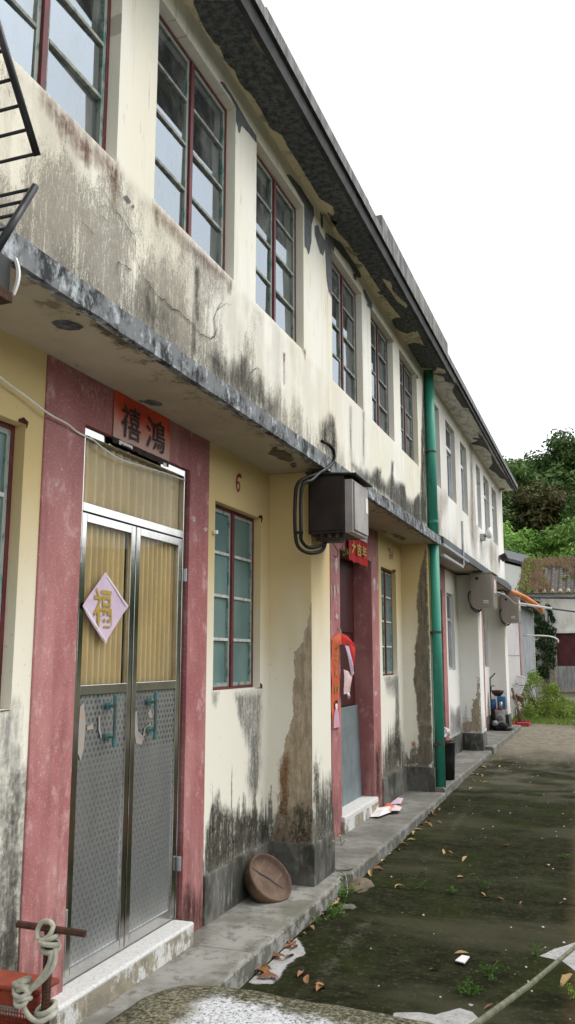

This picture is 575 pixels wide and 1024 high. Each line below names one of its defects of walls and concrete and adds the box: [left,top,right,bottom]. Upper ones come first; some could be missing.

crack [82,207,231,369]
peeling [193,0,468,408]
water stain [355,388,426,523]
water stain [2,716,11,767]
water stain [206,606,332,871]
water stain [376,551,433,793]
water stain [0,783,24,964]